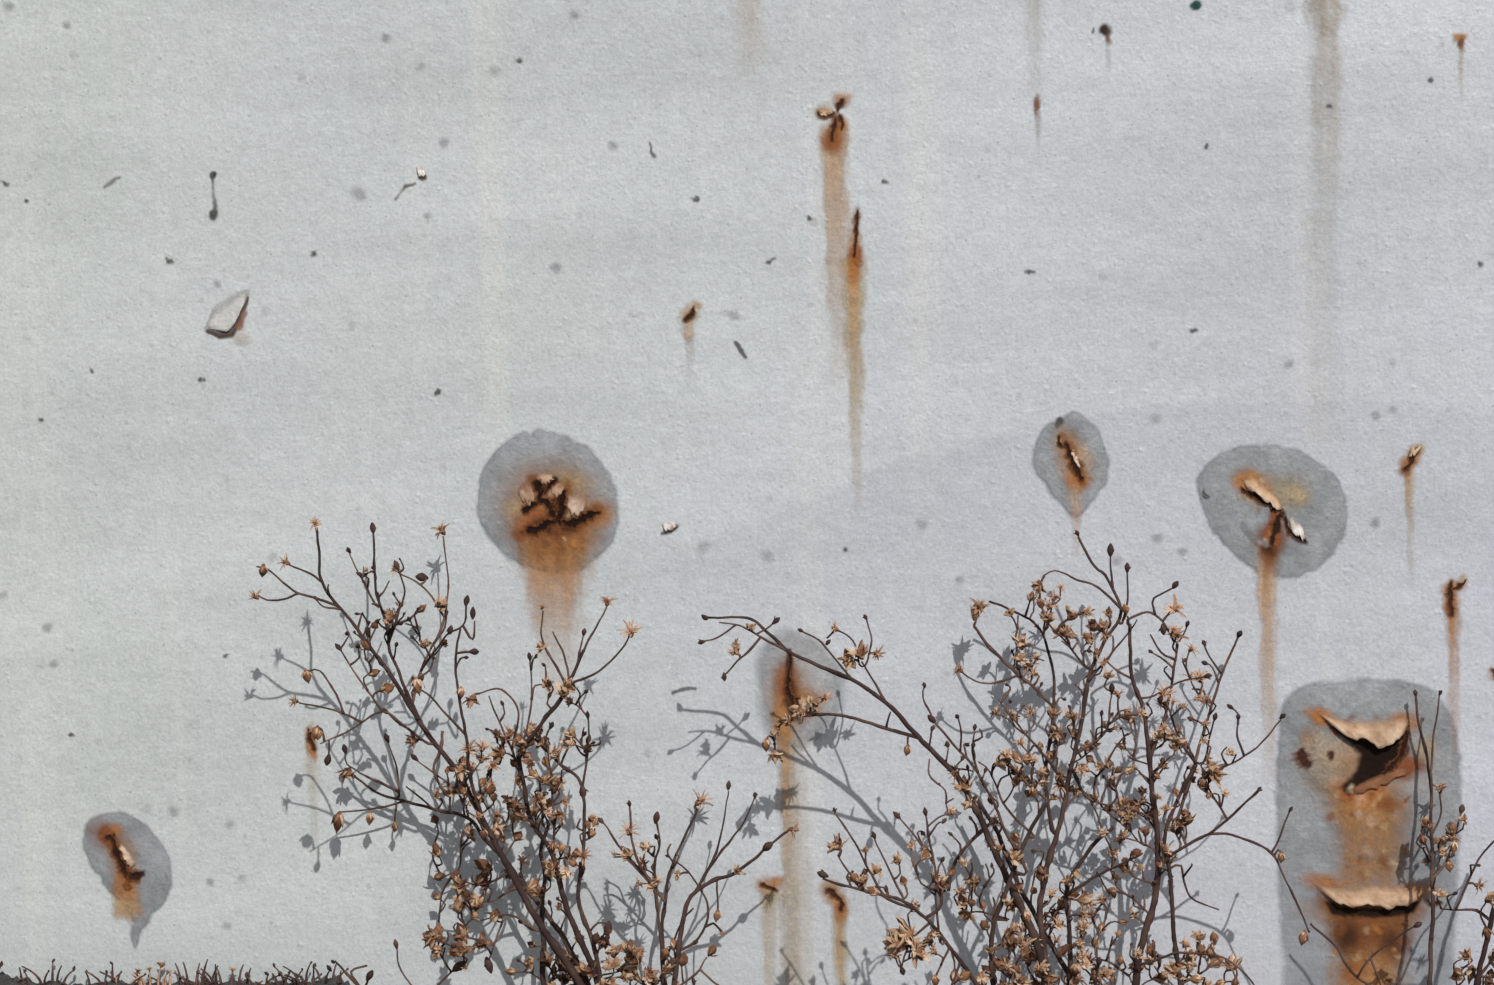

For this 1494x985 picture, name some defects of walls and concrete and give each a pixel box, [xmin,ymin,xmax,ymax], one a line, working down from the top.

peeling [205,290,249,338]
rust [683,303,699,340]
rust [817,95,864,407]
rust [478,430,618,629]
rust [1033,411,1109,517]
rust [1444,575,1466,653]
rust [1197,445,1460,985]
rust [759,634,840,985]
rust [83,812,171,947]
rust [822,883,848,985]